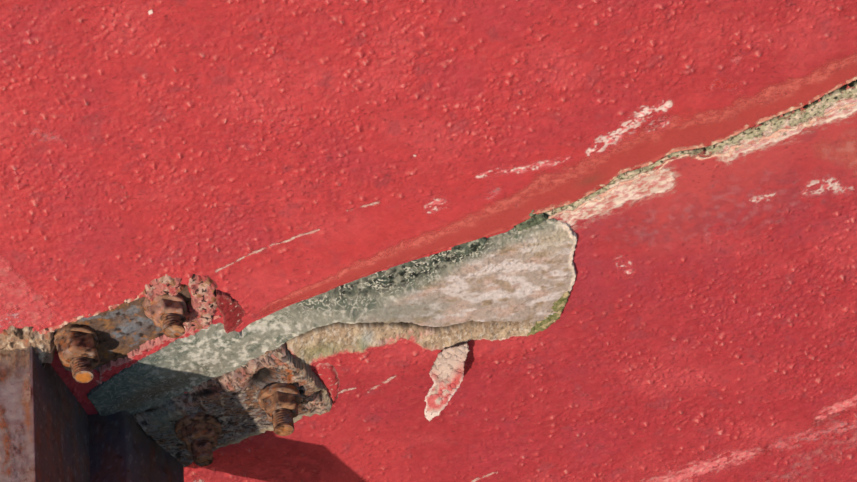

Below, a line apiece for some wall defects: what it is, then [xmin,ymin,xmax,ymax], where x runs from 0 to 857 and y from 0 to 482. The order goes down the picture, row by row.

crack [534,76,857,219]
peeling [721,88,857,163]
spalling [39,169,675,421]